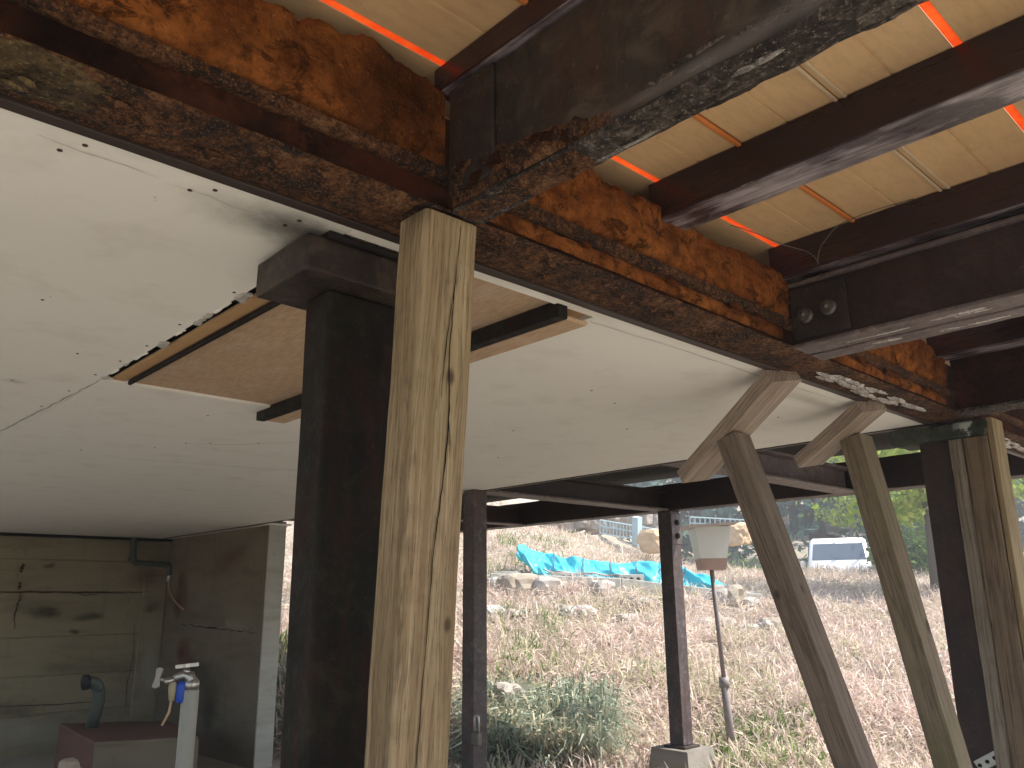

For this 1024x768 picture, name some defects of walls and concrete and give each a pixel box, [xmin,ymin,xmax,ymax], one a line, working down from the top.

corrosion [66,0,446,166]